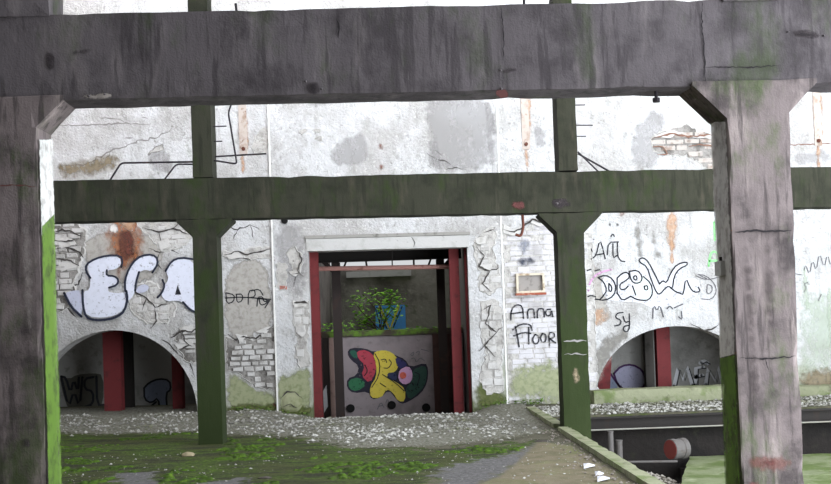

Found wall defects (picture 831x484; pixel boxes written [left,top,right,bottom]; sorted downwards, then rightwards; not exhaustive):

peeling [649,123,713,169]
rust [106,223,142,273]
peeling [222,245,303,291]
crack [478,219,541,356]
rust [667,213,677,264]
peeling [225,326,276,392]
peeling [292,300,312,369]